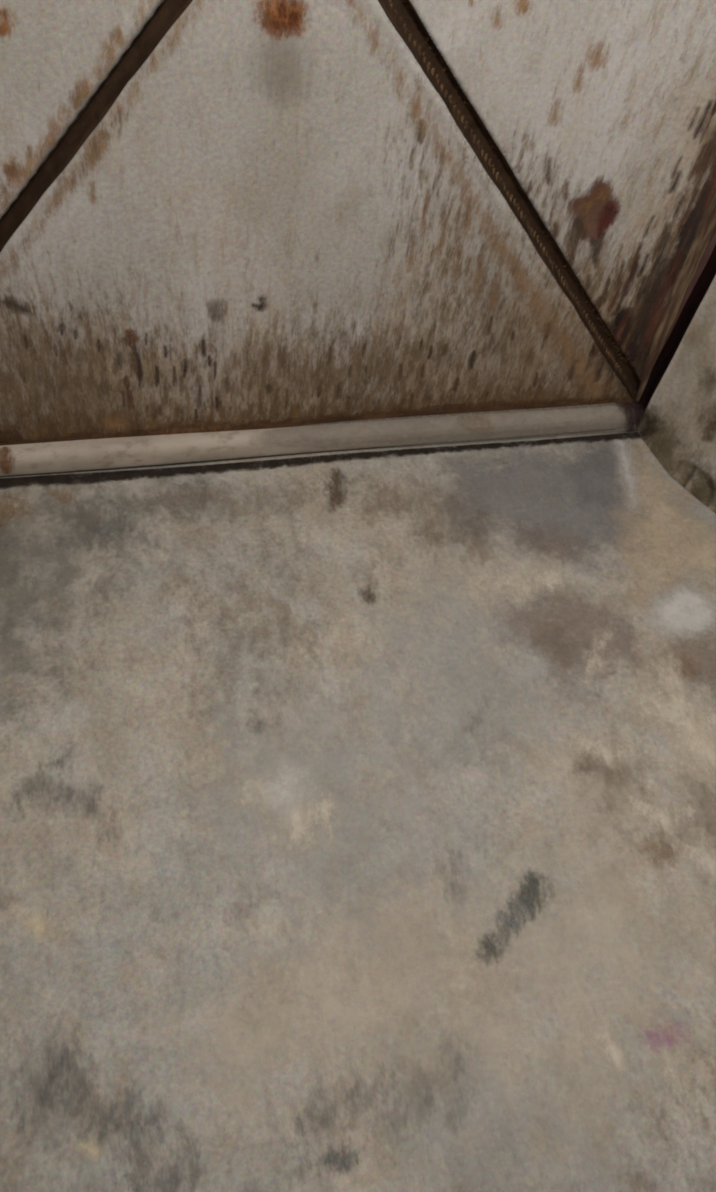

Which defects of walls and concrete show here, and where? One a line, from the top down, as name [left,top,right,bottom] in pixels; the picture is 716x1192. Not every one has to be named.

rust [258,0,306,40]
rust [0,102,716,474]
water stain [640,407,716,512]
water stain [509,597,635,676]